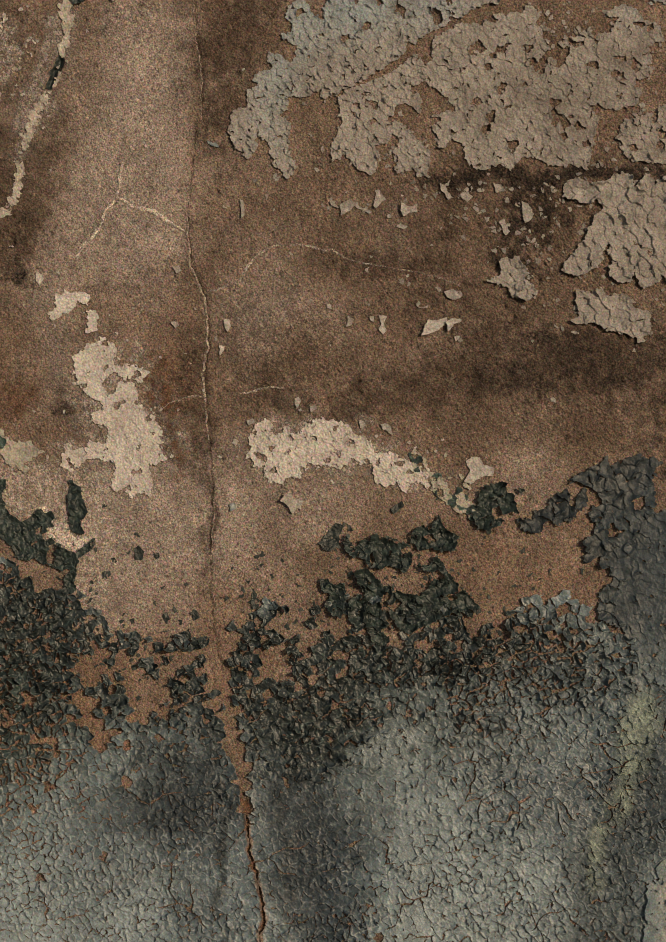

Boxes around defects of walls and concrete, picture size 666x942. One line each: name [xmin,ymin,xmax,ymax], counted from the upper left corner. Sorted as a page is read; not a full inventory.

peeling [0,55,68,218]
crack [193,0,204,136]
peeling [228,0,666,343]
crack [74,159,342,661]
peeling [0,289,666,942]
crack [240,797,266,942]